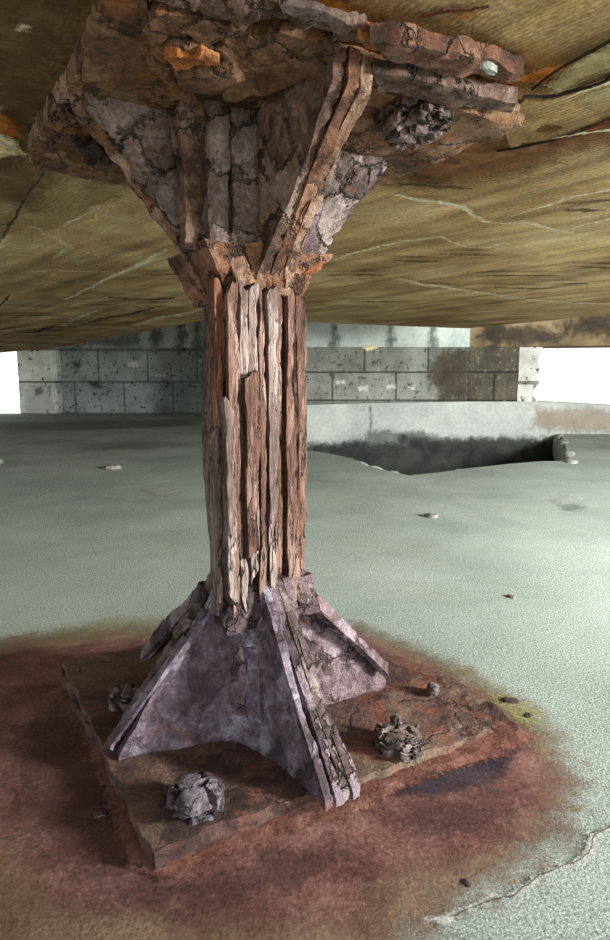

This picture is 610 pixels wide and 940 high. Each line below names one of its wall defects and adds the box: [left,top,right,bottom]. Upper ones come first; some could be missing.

peeling [480,61,497,76]
crack [522,39,610,100]
spalling [0,106,28,159]
crack [497,119,610,152]
crack [0,172,45,248]
crack [4,296,201,333]
water stain [477,315,610,350]
water stain [427,328,471,401]
rust [28,0,573,812]
rust [0,579,581,940]
crack [426,827,610,924]